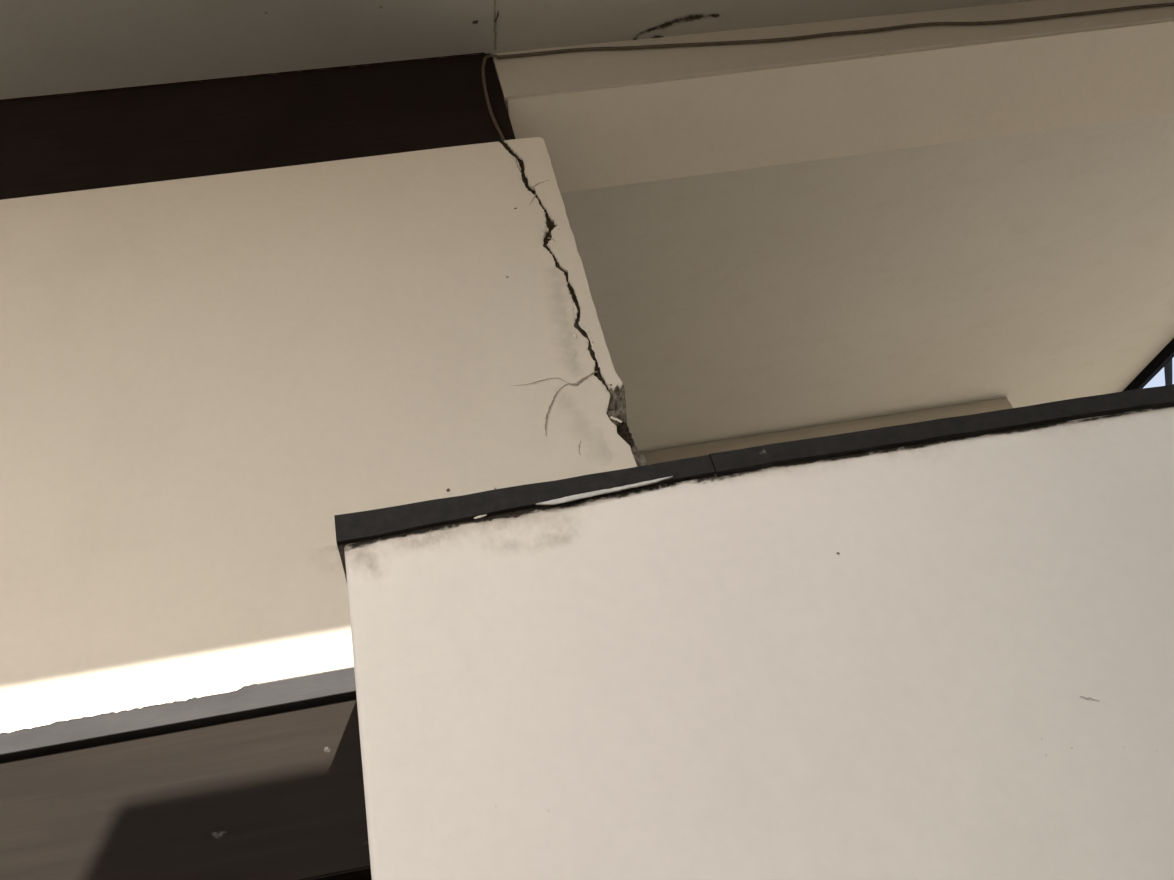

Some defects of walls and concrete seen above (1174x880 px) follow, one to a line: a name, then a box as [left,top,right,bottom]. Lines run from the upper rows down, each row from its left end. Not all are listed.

crack [492,0,500,50]
crack [501,142,609,436]
spalling [504,137,648,467]